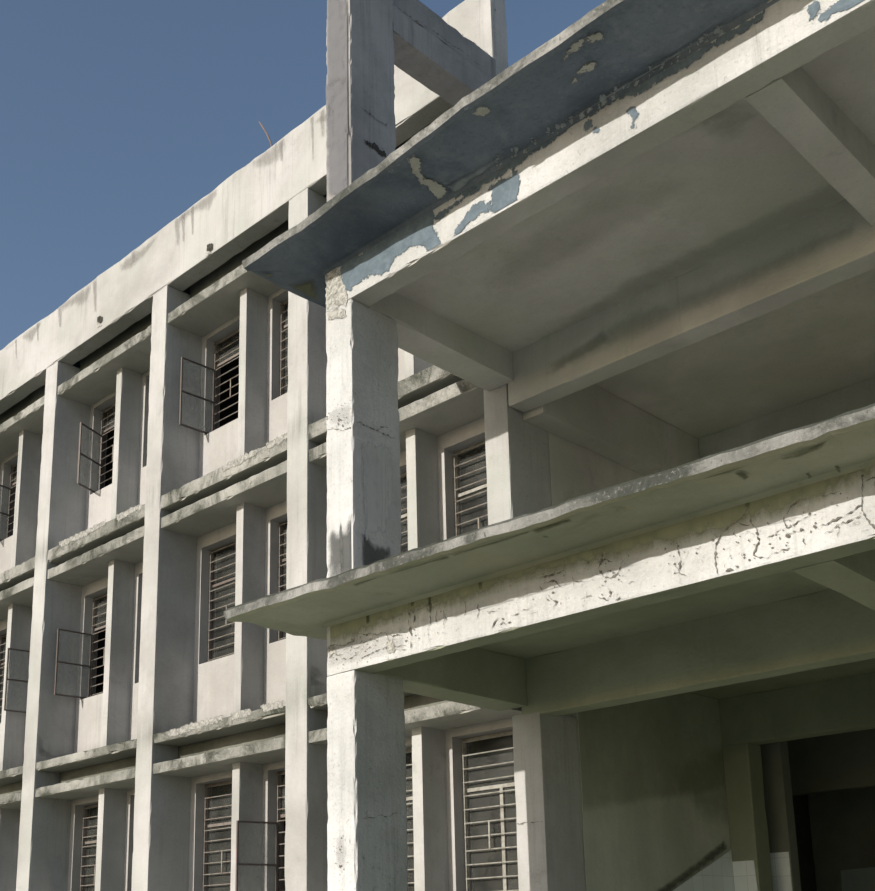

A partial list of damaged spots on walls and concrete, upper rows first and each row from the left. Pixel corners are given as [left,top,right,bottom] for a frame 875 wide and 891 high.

peeling [807,0,864,22]
peeling [325,9,765,321]
damp [330,521,351,575]
damp [363,536,390,565]
crack [664,474,875,578]
crack [328,551,634,659]